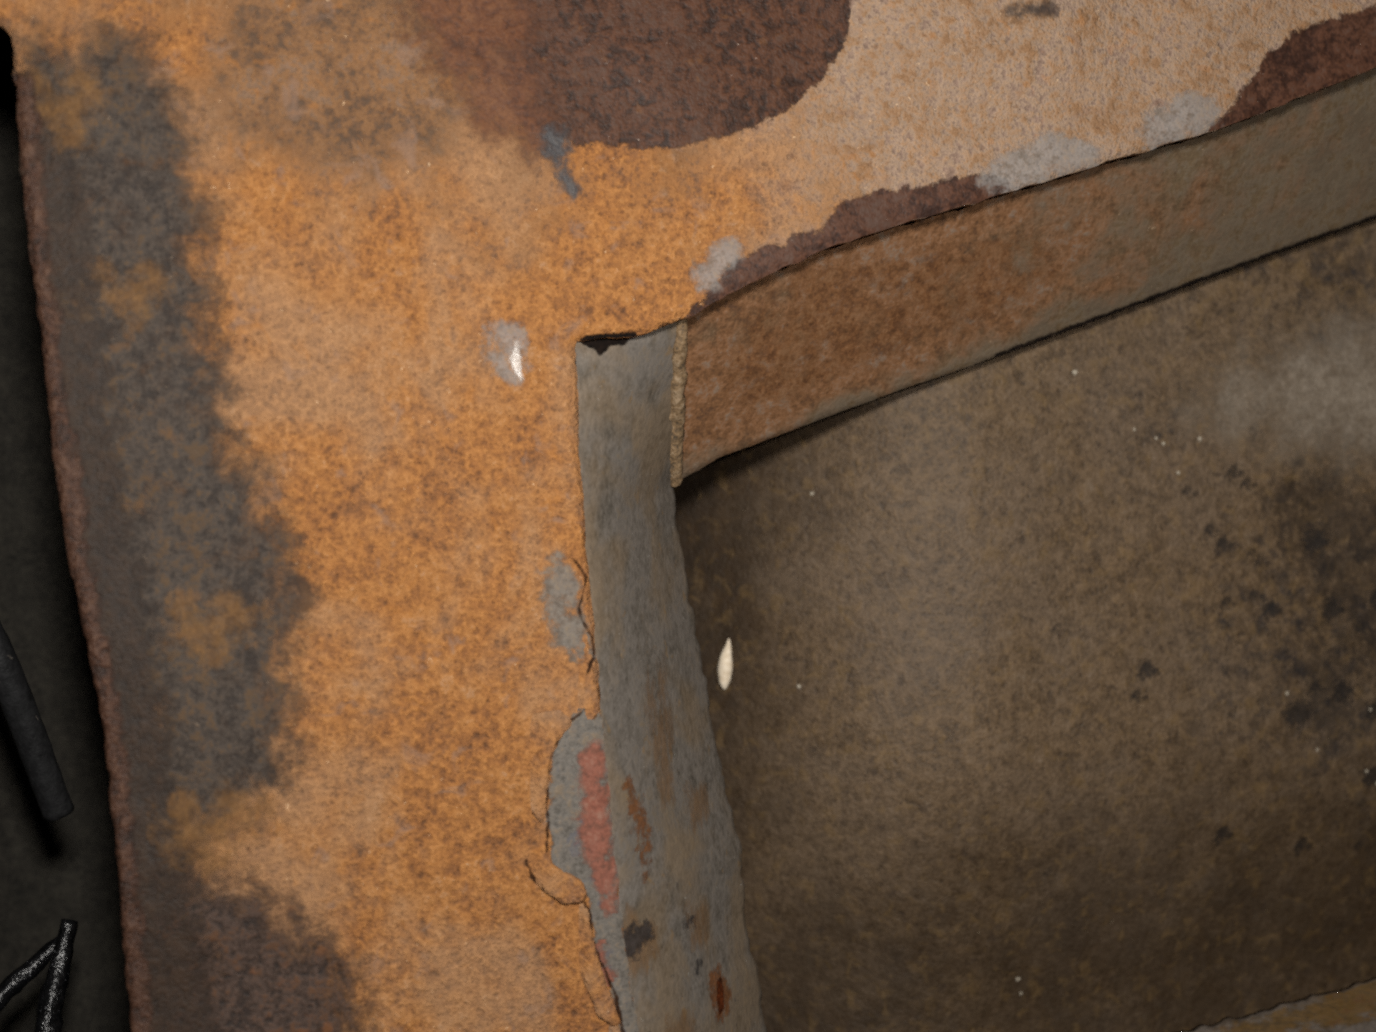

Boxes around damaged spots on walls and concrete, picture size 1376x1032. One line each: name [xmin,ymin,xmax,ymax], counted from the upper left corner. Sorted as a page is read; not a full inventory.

rust [1209,5,1376,131]
peeling [525,552,653,1032]